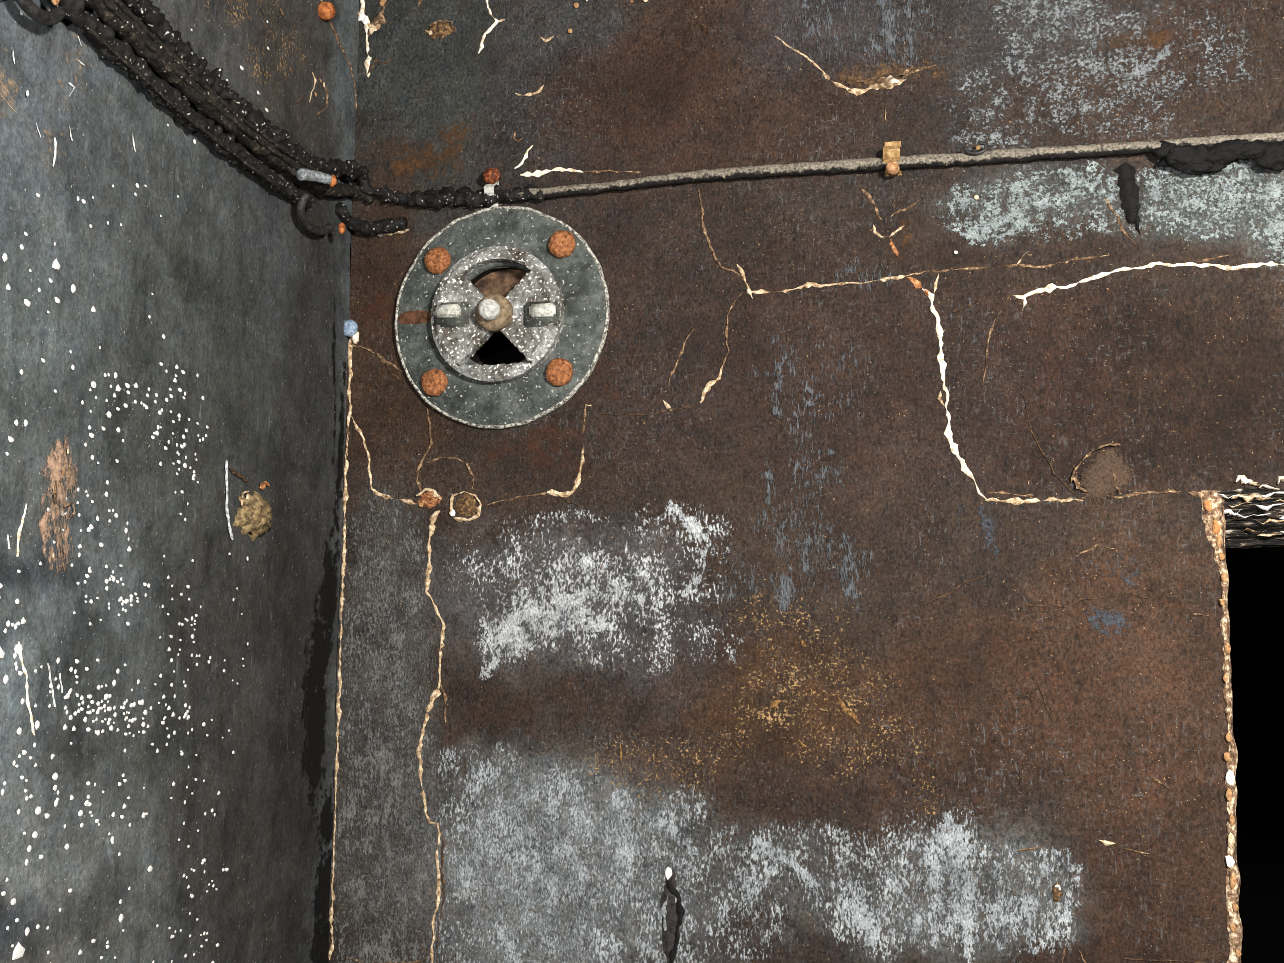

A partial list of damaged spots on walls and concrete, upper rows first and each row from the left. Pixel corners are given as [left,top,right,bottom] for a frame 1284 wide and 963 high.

crack [358,0,392,77]
crack [478,0,505,53]
crack [775,36,936,119]
peeling [781,0,939,67]
spalling [936,0,1284,270]
damp [1105,163,1141,244]
crack [328,186,1284,963]
rust [579,594,943,814]
spalling [1201,475,1284,963]